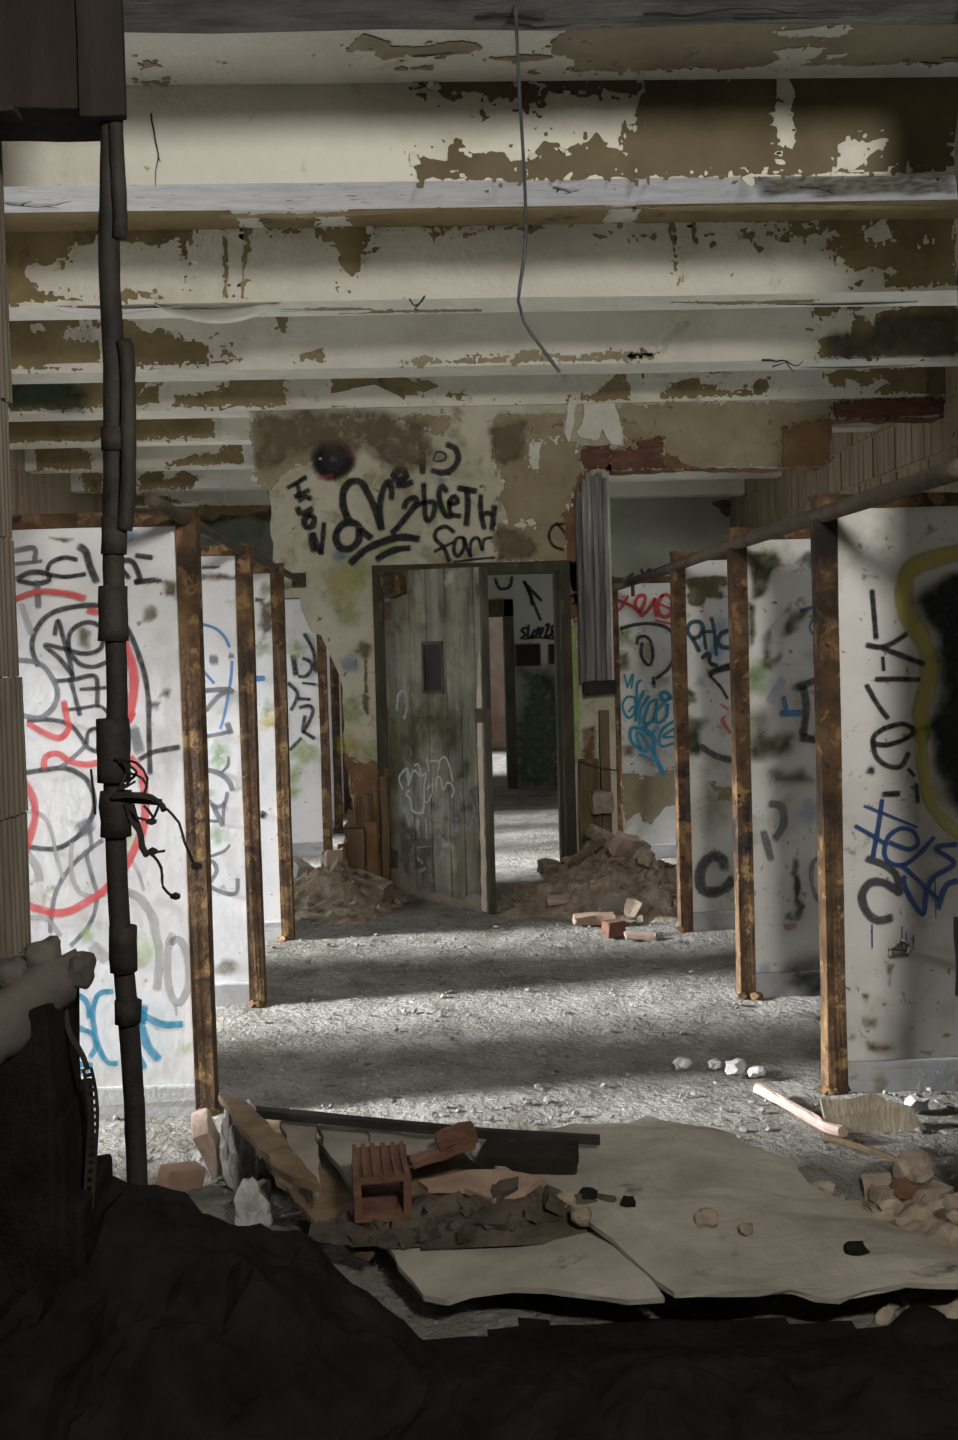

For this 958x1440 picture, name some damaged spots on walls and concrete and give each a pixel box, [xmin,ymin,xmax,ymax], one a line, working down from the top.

peeling [120,23,958,623]
peeling [255,598,272,633]
peeling [748,553,808,669]